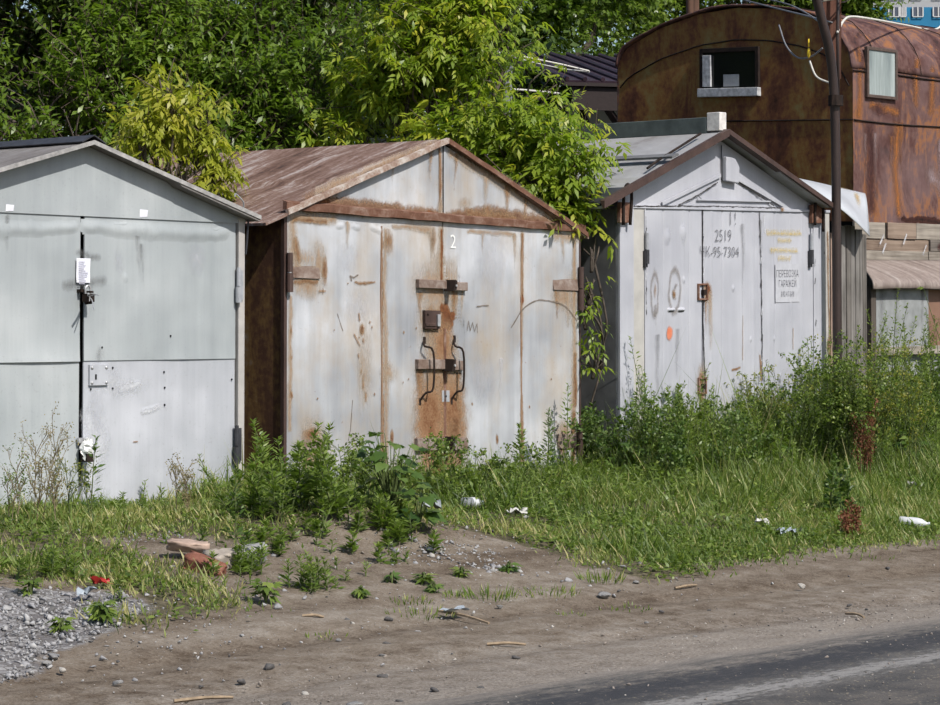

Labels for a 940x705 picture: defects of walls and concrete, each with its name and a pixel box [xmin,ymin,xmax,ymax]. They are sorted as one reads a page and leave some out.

corrosion [855,104,882,211]
corrosion [288,141,578,468]
corrosion [419,450,461,474]